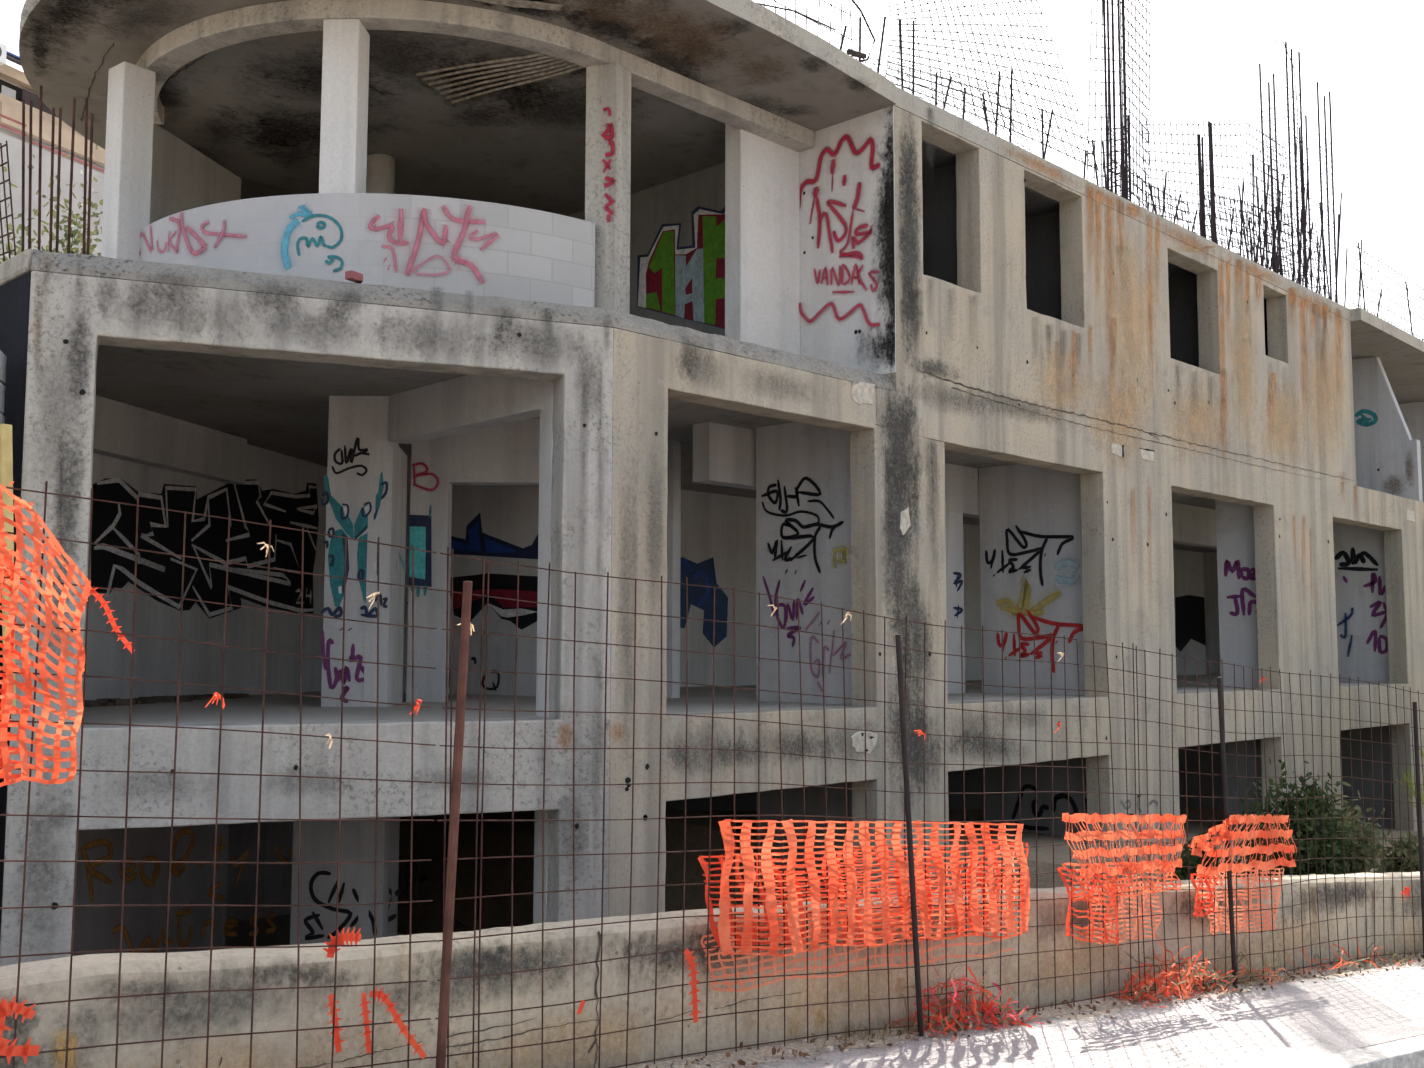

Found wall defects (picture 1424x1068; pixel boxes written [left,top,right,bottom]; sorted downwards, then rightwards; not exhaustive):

damp [23,0,167,53]
damp [252,54,322,163]
damp [369,36,586,124]
damp [858,137,919,363]
rust [1088,189,1134,247]
damp [917,361,946,377]
rust [1220,261,1260,405]
rust [1290,289,1340,380]
damp [431,946,565,996]
damp [657,936,730,968]